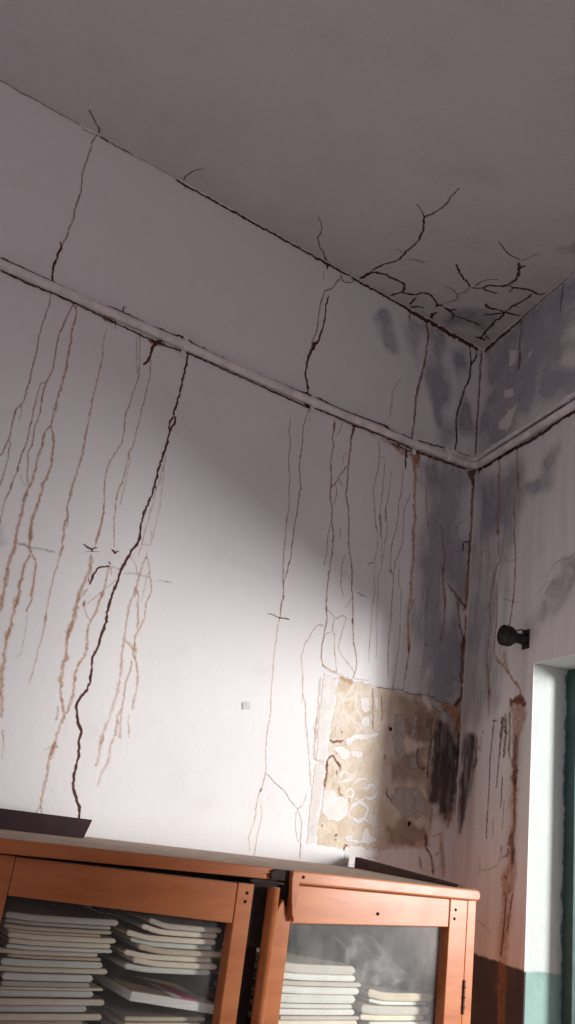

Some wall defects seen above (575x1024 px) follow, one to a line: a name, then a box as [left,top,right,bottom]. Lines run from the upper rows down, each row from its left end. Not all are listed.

crack [72,340,189,818]
crack [2,81,566,454]
corrosion [0,257,575,730]
leakage [427,280,575,442]
peeling [307,673,444,865]
leakage [417,712,511,839]
corrosion [487,661,525,956]